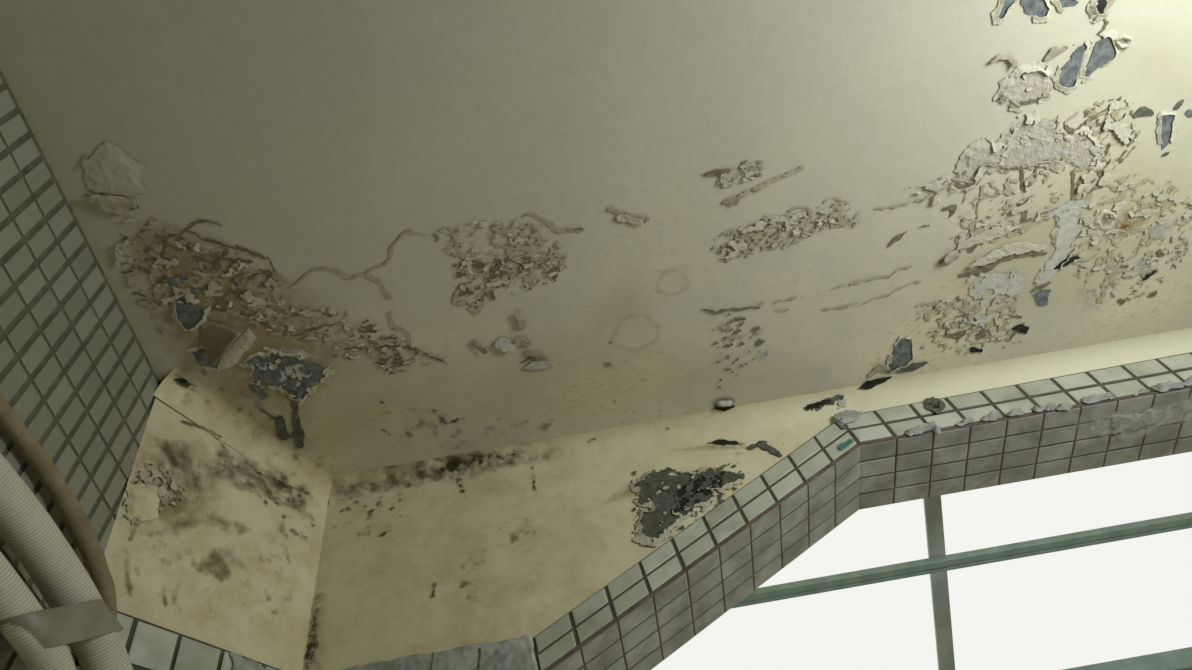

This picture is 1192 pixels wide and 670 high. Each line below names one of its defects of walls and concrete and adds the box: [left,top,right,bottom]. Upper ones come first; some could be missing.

peeling [704,160,804,206]
peeling [859,0,1192,389]
peeling [713,197,862,262]
peeling [76,141,448,448]
peeling [436,213,585,315]
peeling [804,394,862,429]
spalling [924,397,946,413]
water stain [163,443,186,466]
water stain [219,452,308,537]
water stain [387,453,516,492]